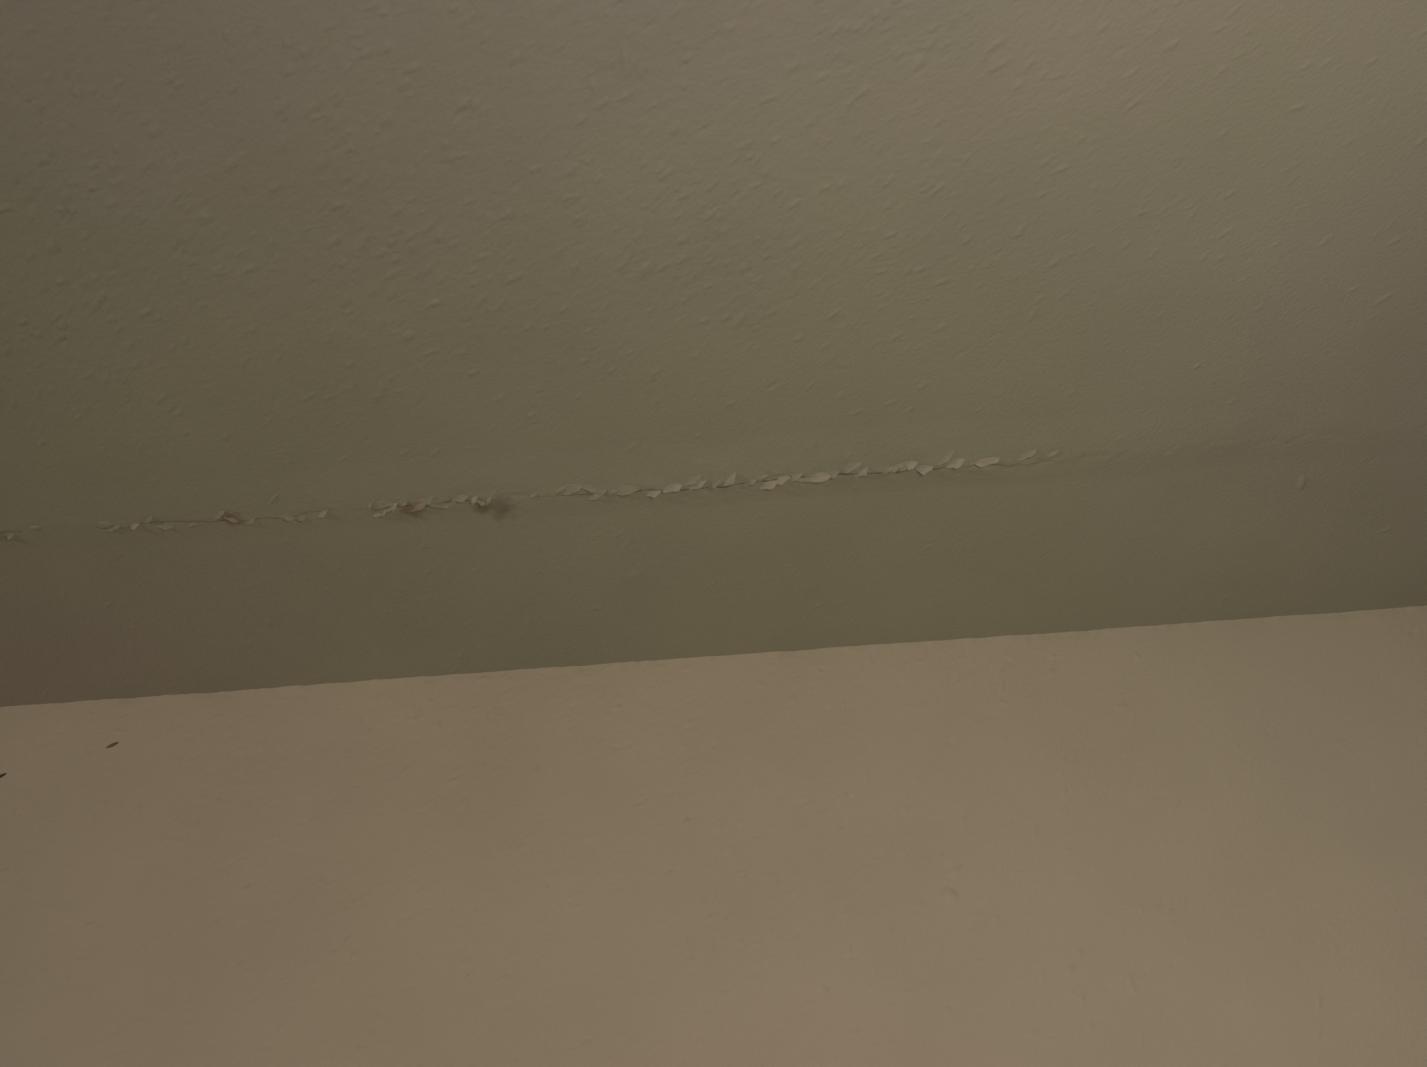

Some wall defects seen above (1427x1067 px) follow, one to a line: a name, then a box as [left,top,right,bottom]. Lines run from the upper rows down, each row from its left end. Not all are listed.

peeling [528,449,1060,501]